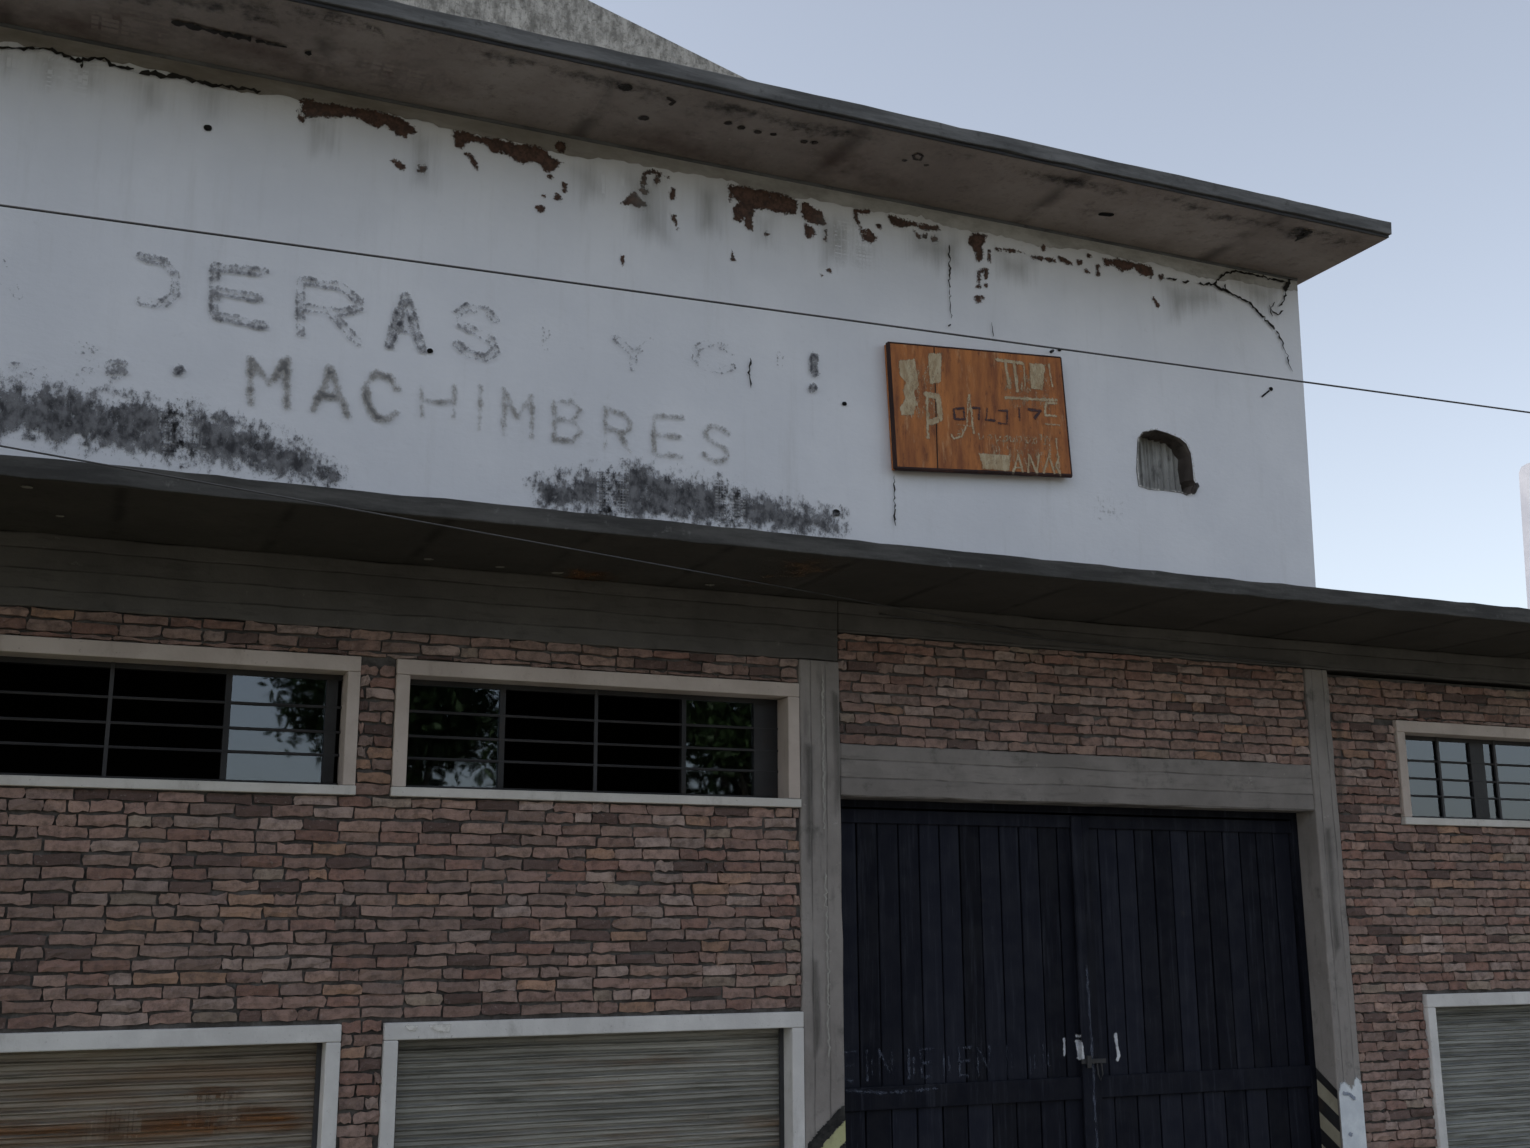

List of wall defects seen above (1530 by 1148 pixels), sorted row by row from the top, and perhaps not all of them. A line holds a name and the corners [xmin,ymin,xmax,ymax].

peeling [297,98,417,139]
peeling [389,159,428,173]
peeling [453,129,568,213]
peeling [620,169,679,230]
peeling [727,184,827,242]
peeling [853,209,941,243]
crack [1295,230,1313,241]
crack [1167,270,1293,370]
damp [0,375,342,487]
damp [528,458,849,536]